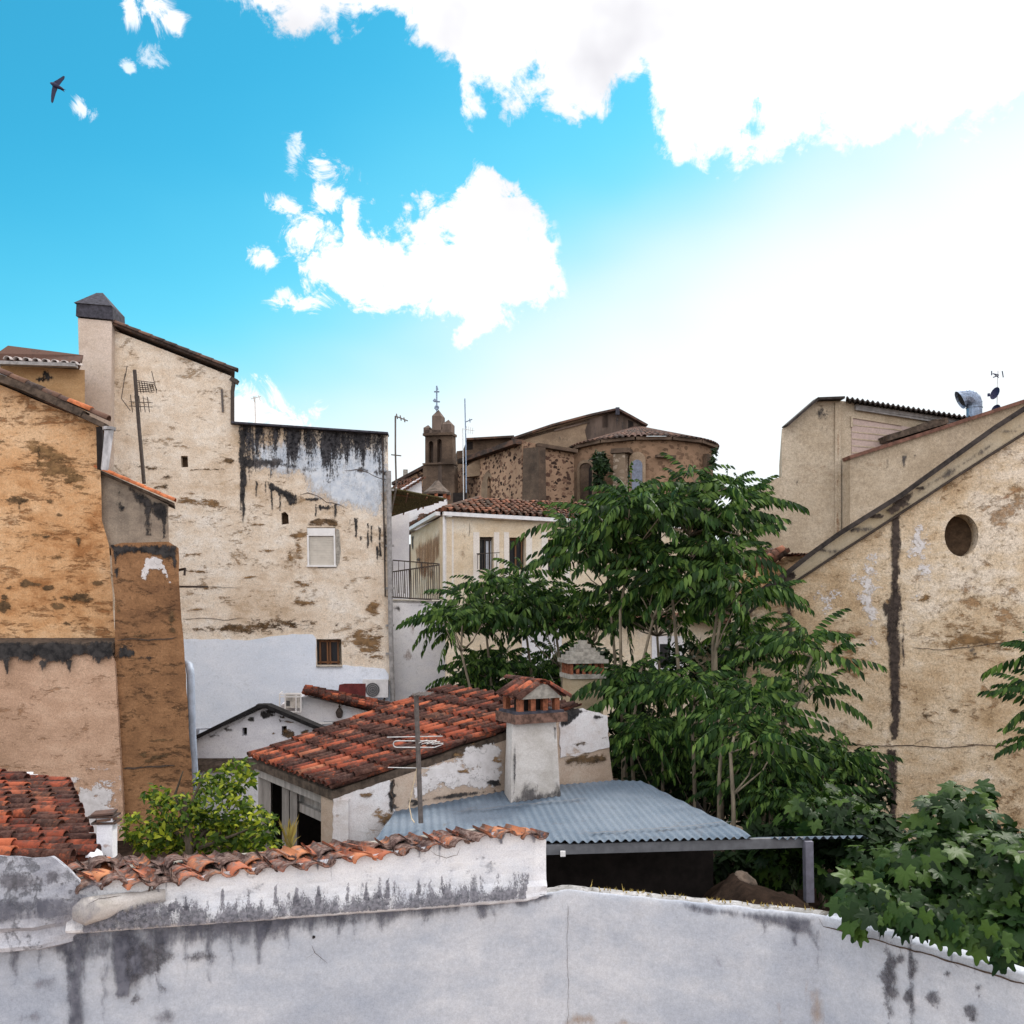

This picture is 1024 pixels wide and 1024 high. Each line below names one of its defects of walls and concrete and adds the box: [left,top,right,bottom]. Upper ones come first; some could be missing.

damp [238,425,388,521]
damp [110,487,177,578]
peeling [141,557,171,583]
peeling [817,553,882,621]
peeling [907,524,933,580]
damp [883,516,905,821]
peeling [414,743,502,798]
damp [55,903,501,1024]
damp [879,935,916,1024]